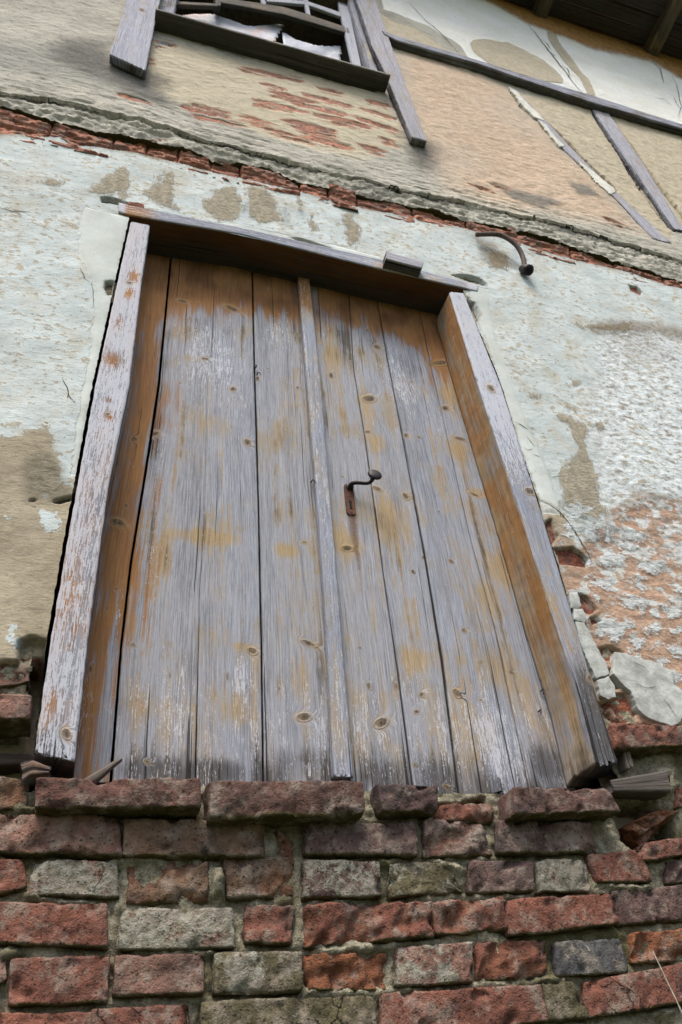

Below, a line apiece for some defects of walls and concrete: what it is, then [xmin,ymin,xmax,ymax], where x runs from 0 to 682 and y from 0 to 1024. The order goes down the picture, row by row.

spalling [181,69,398,156]
peeling [508,87,565,149]
spalling [0,108,682,295]
peeling [575,322,629,331]
peeling [543,405,682,727]